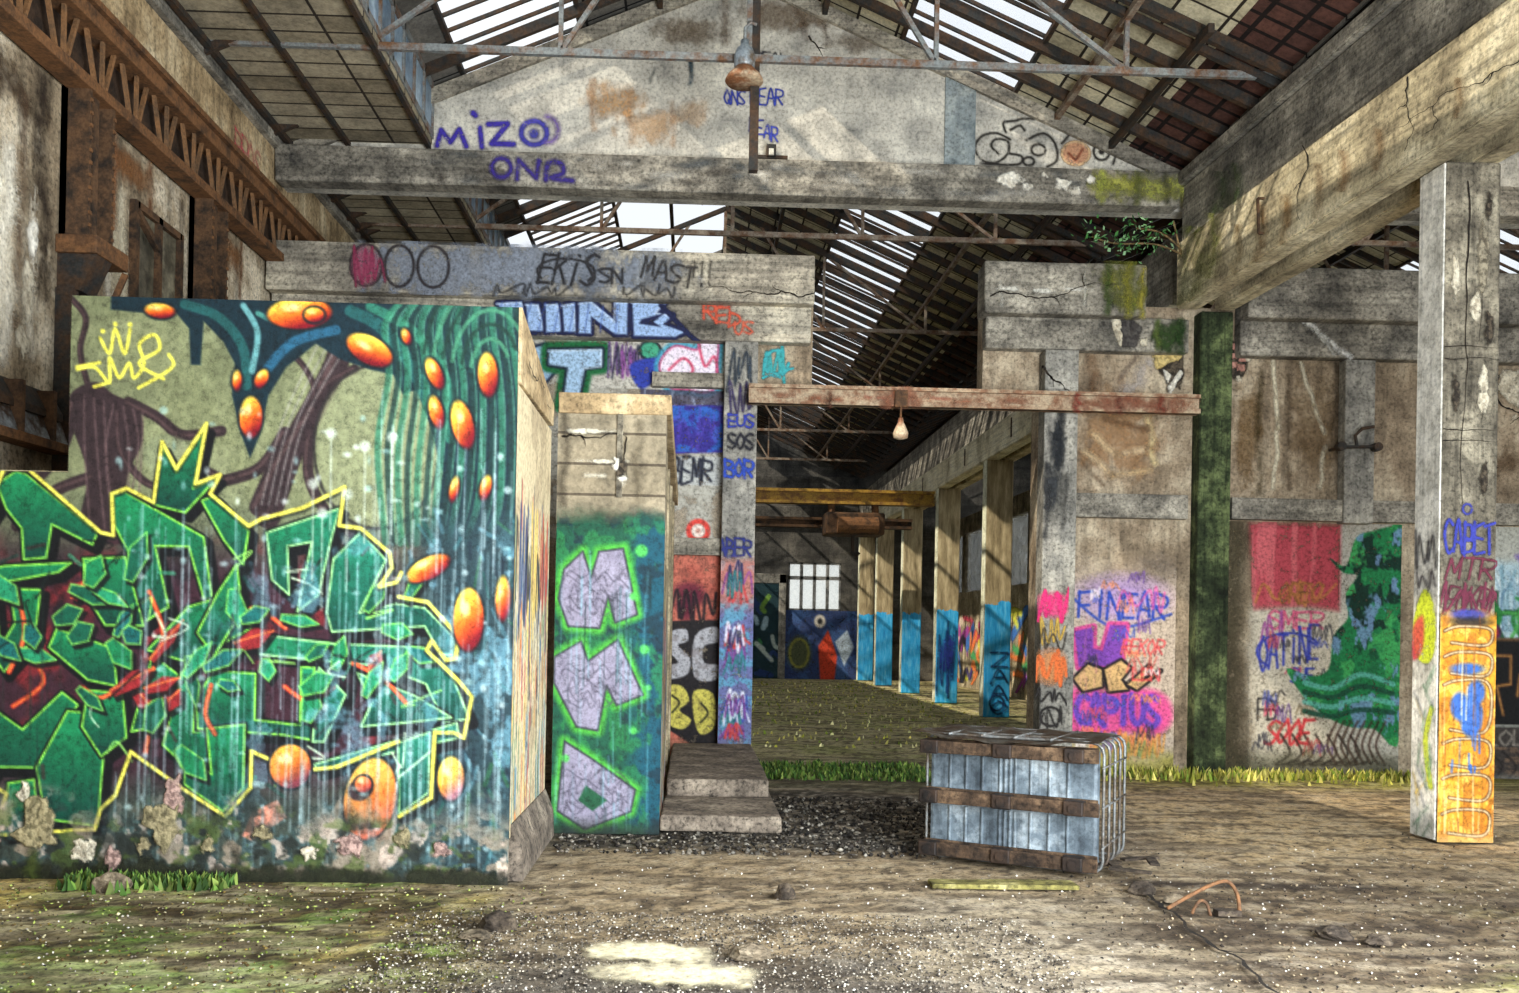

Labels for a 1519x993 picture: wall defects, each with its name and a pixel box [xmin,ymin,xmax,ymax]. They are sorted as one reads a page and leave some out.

damp [0,55,52,363]
corrosion [227,243,242,300]
damp [999,287,1087,302]
damp [1105,264,1186,393]
damp [1084,414,1157,484]